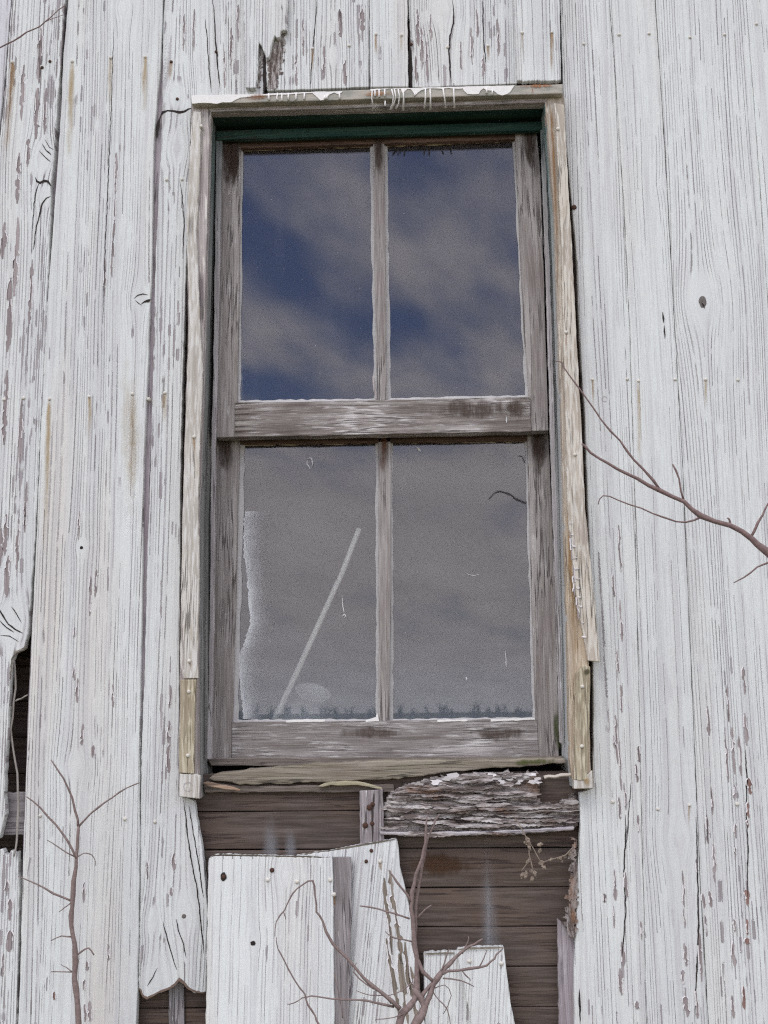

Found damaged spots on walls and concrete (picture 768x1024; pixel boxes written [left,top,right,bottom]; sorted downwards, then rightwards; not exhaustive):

peeling [15,27,47,204]
crack [261,54,269,90]
crack [447,1,455,78]
crack [32,140,52,249]
peeling [0,217,34,352]
peeling [1,370,24,463]
peeling [0,481,28,597]
peeling [611,525,641,819]
peeling [415,773,459,786]
peeling [488,773,542,784]
peeling [724,686,753,861]
peeling [680,788,717,1019]